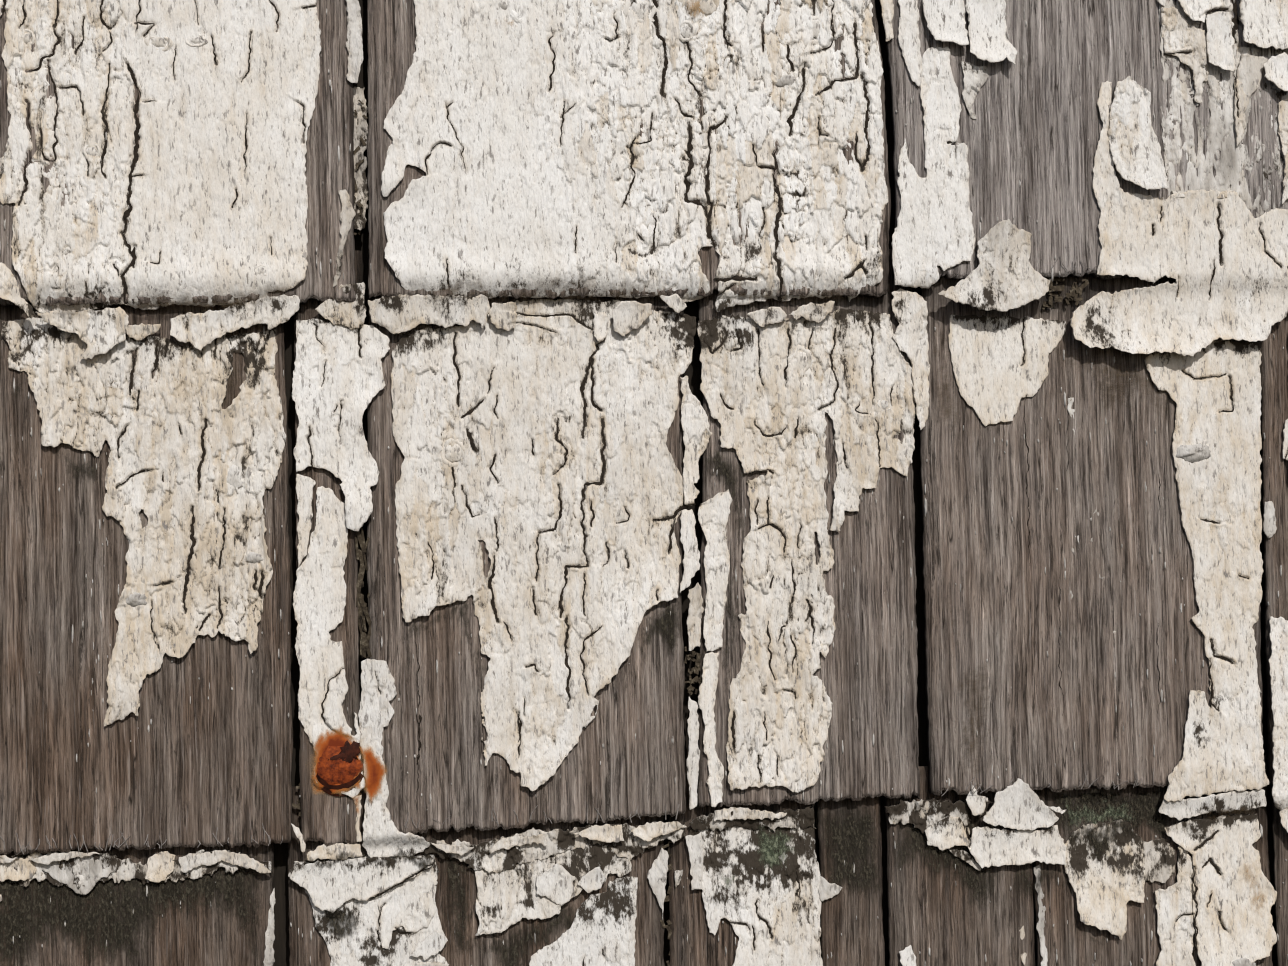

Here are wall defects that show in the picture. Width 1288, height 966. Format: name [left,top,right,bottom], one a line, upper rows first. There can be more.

crack [2,0,176,301]
crack [548,36,575,141]
crack [615,0,726,261]
crack [713,0,871,302]
peeling [0,849,272,902]
peeling [0,0,322,727]
peeling [263,889,275,966]
rust [312,728,386,812]
crack [451,312,696,756]
crack [731,470,815,779]
peeling [288,0,1288,966]
crack [704,326,894,463]